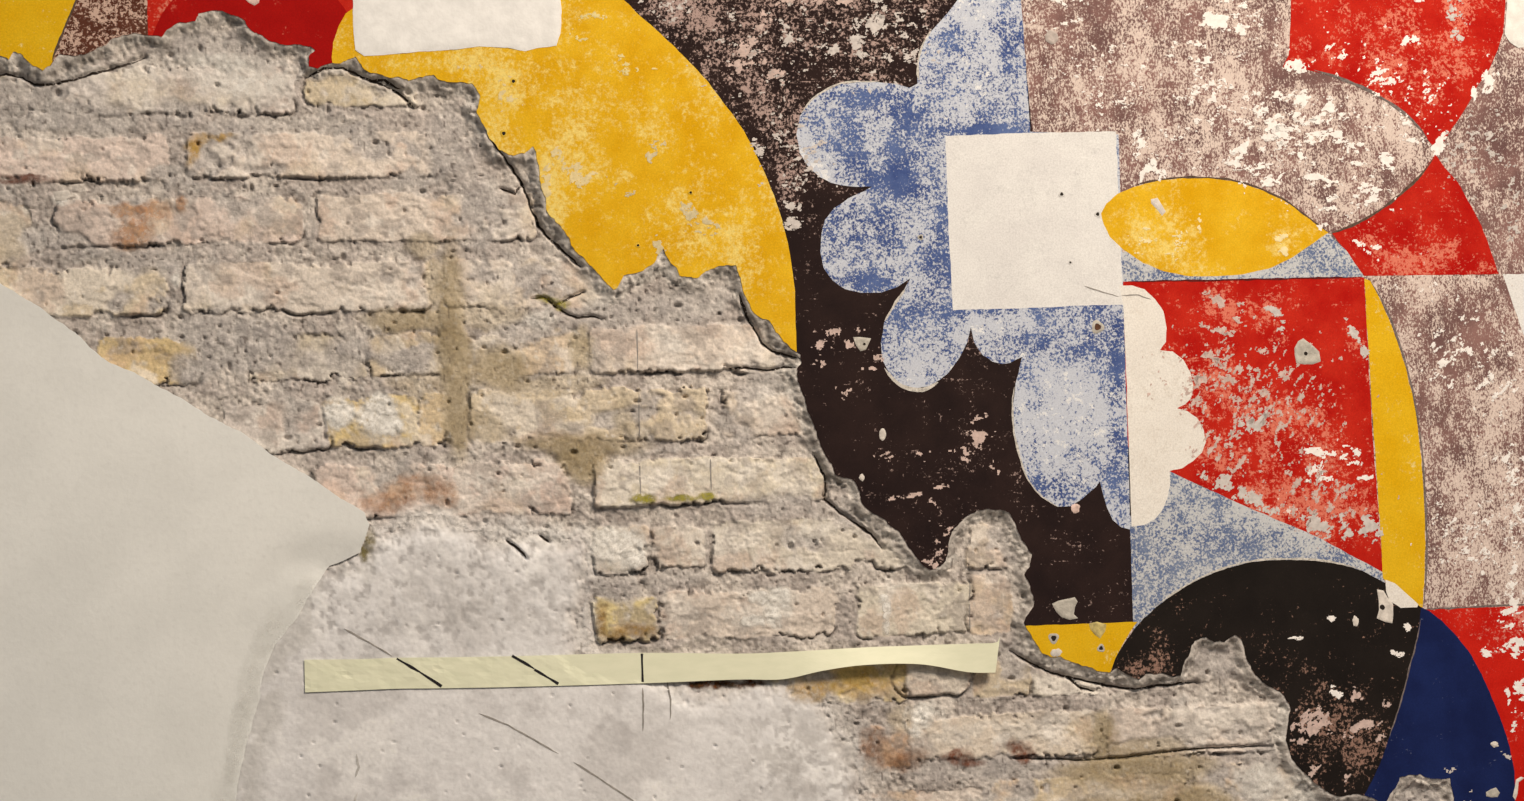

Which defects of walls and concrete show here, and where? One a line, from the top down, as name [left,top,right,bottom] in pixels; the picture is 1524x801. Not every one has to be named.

peeling [701,0,959,230]
peeling [1121,0,1524,261]
peeling [811,327,884,371]
peeling [916,413,1001,475]
flaking render [1142,290,1384,551]
peeling [1429,443,1524,660]
crack [345,629,391,656]
flaking render [1052,597,1106,638]
flaking render [1377,589,1412,632]
crack [642,683,672,728]
crack [479,713,634,801]
flaking render [1387,767,1456,801]